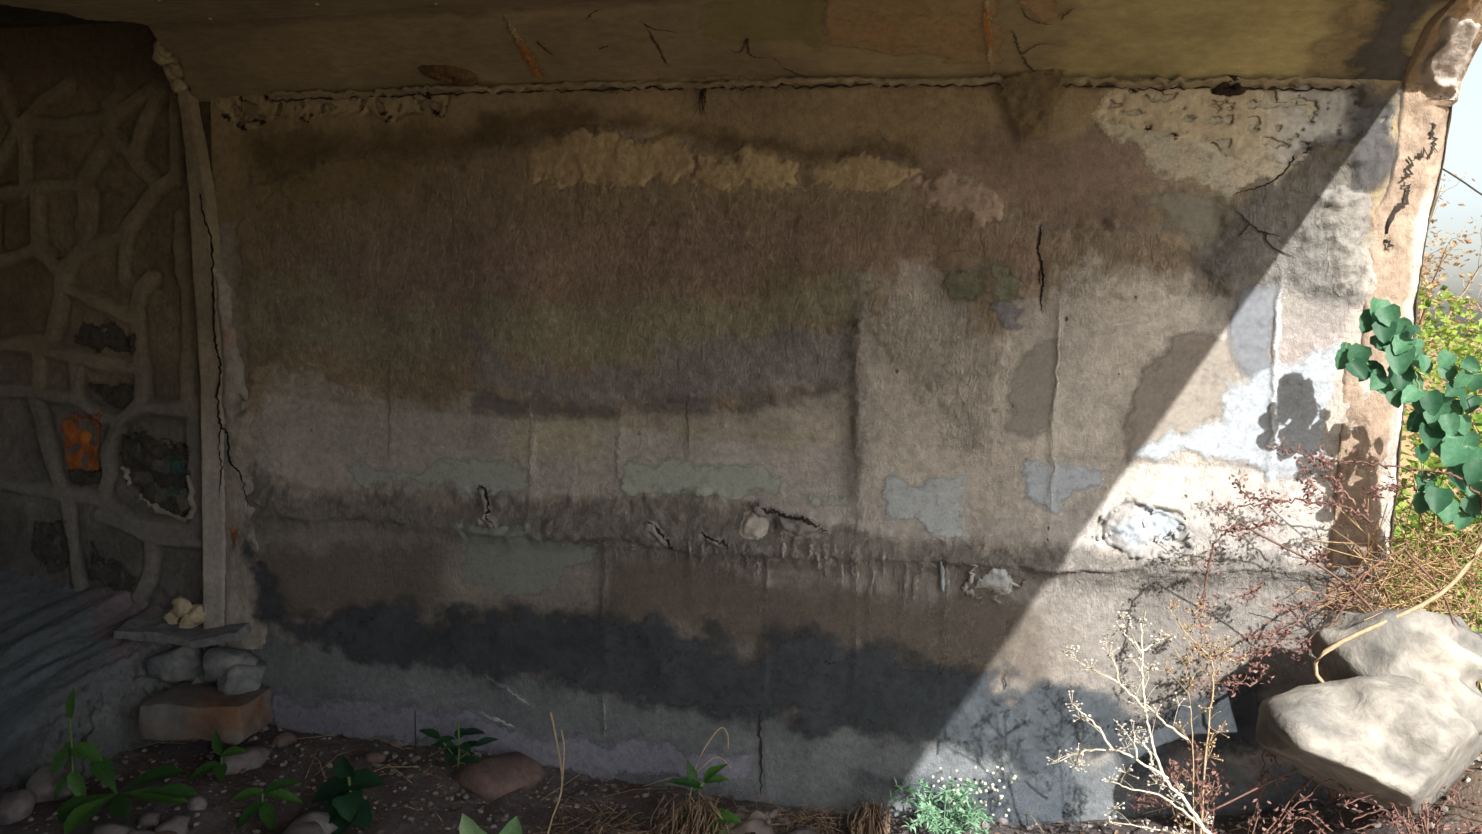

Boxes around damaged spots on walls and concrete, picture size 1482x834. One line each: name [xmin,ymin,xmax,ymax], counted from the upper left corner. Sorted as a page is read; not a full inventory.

crack [1233,154,1295,258]
damp [943,262,1024,330]
crack [1036,224,1045,313]
crack [199,193,248,506]
damp [473,392,616,420]
spalling [640,518,675,550]
spalling [694,498,831,552]
flaking render [961,565,1026,604]
damp [243,520,1265,826]